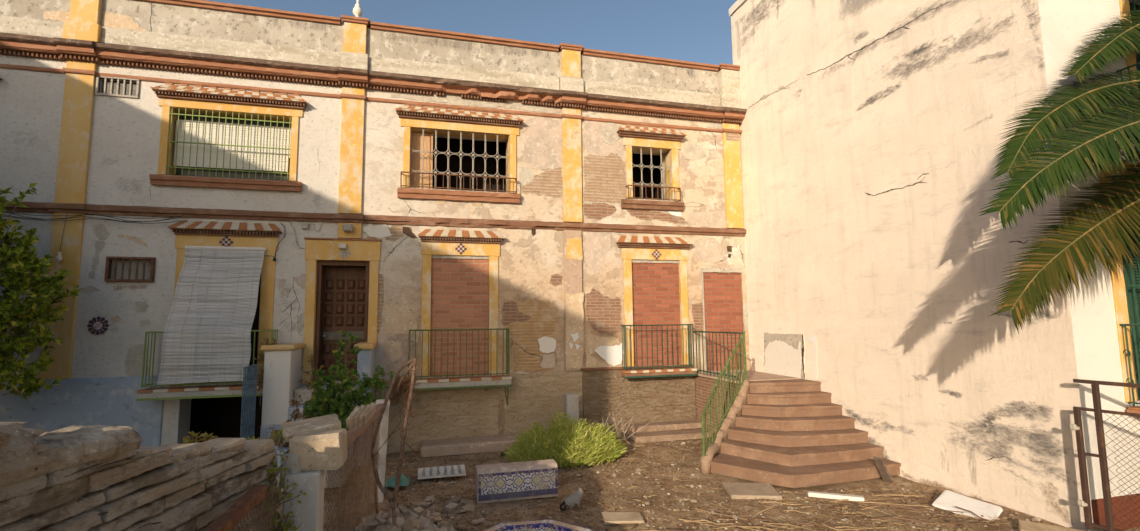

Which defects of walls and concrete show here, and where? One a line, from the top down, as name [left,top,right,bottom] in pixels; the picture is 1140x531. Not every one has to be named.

crack [750,1,952,107]
peeling [497,101,563,198]
crack [866,173,930,196]
flaking render [502,120,732,373]
leakage [963,403,1061,473]